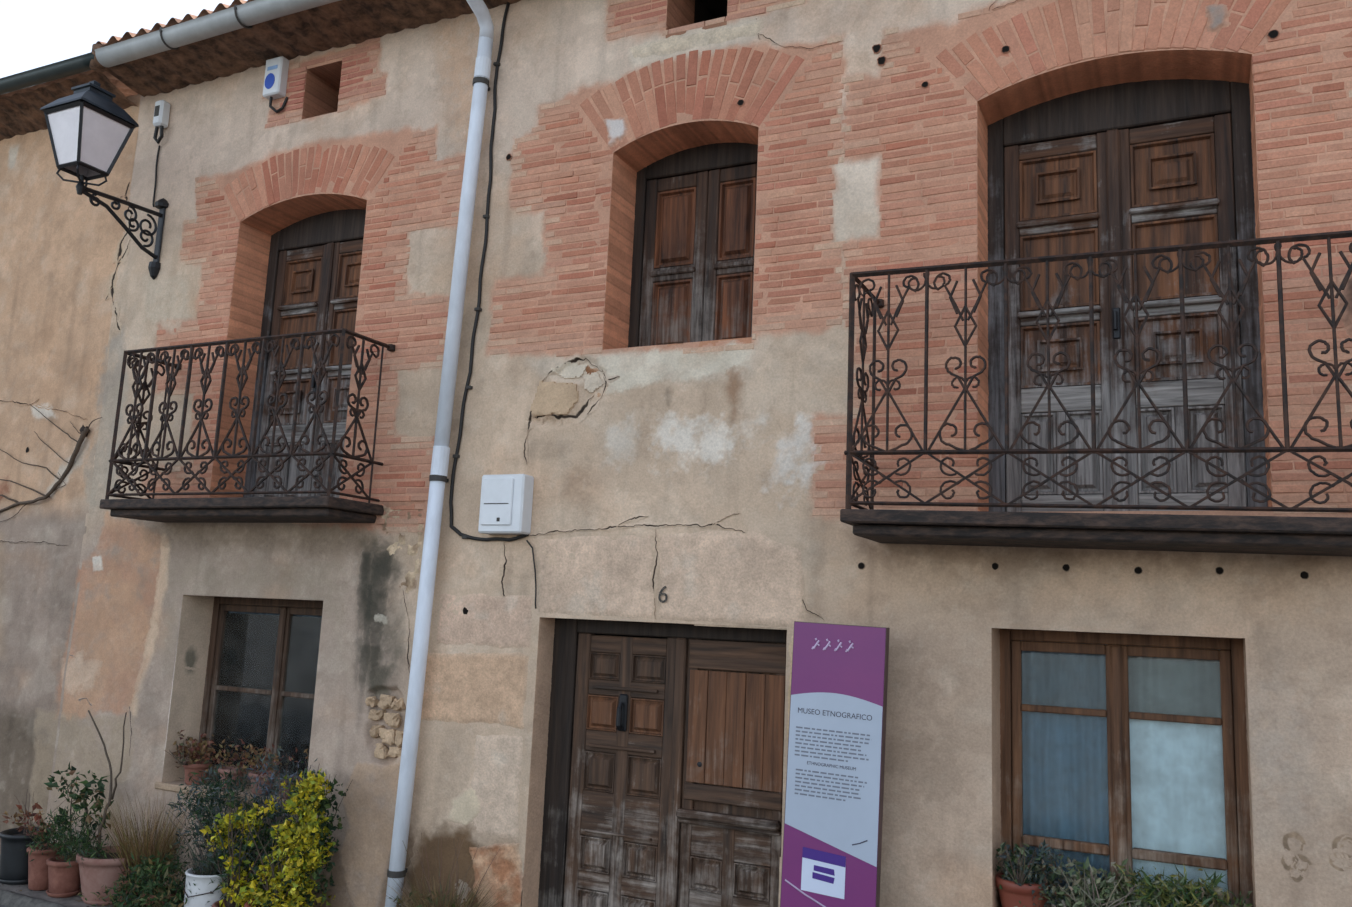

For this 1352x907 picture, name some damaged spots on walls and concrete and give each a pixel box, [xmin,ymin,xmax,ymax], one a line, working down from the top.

peeling [522,340,757,464]
crack [499,513,748,619]
damp [154,525,413,737]